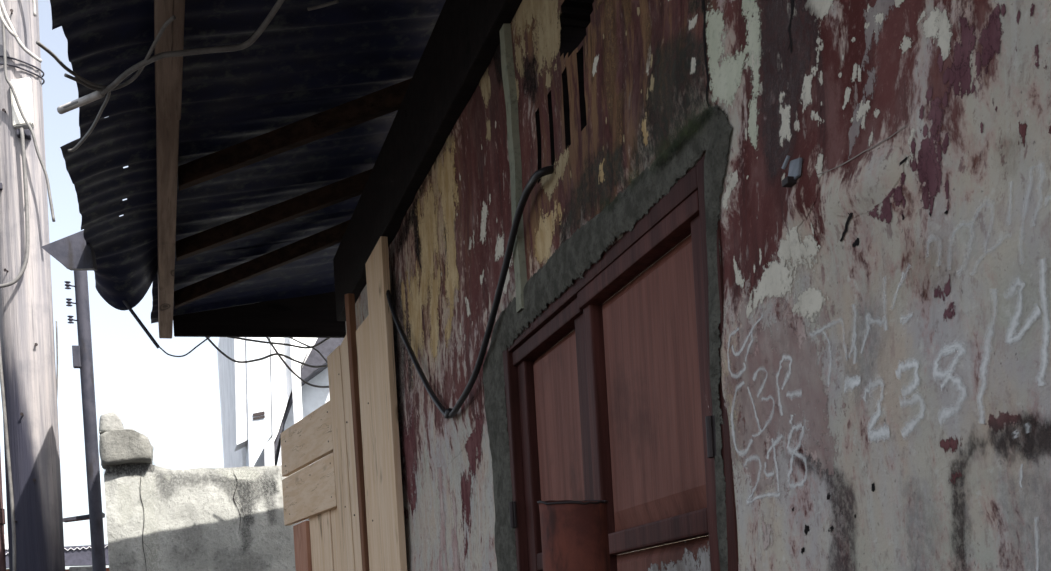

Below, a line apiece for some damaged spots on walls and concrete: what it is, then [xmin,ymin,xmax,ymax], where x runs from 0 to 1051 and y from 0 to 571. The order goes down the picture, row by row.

peeling [401,133,513,379]
water stain [523,58,537,100]
peeling [510,0,565,106]
peeling [533,147,572,264]
water stain [560,32,706,244]
peeling [656,0,764,167]
peeling [733,223,830,352]
peeling [778,0,833,147]
peeling [838,55,880,146]
peeling [877,3,1004,224]
crack [140,480,152,571]
water stain [951,415,1051,571]